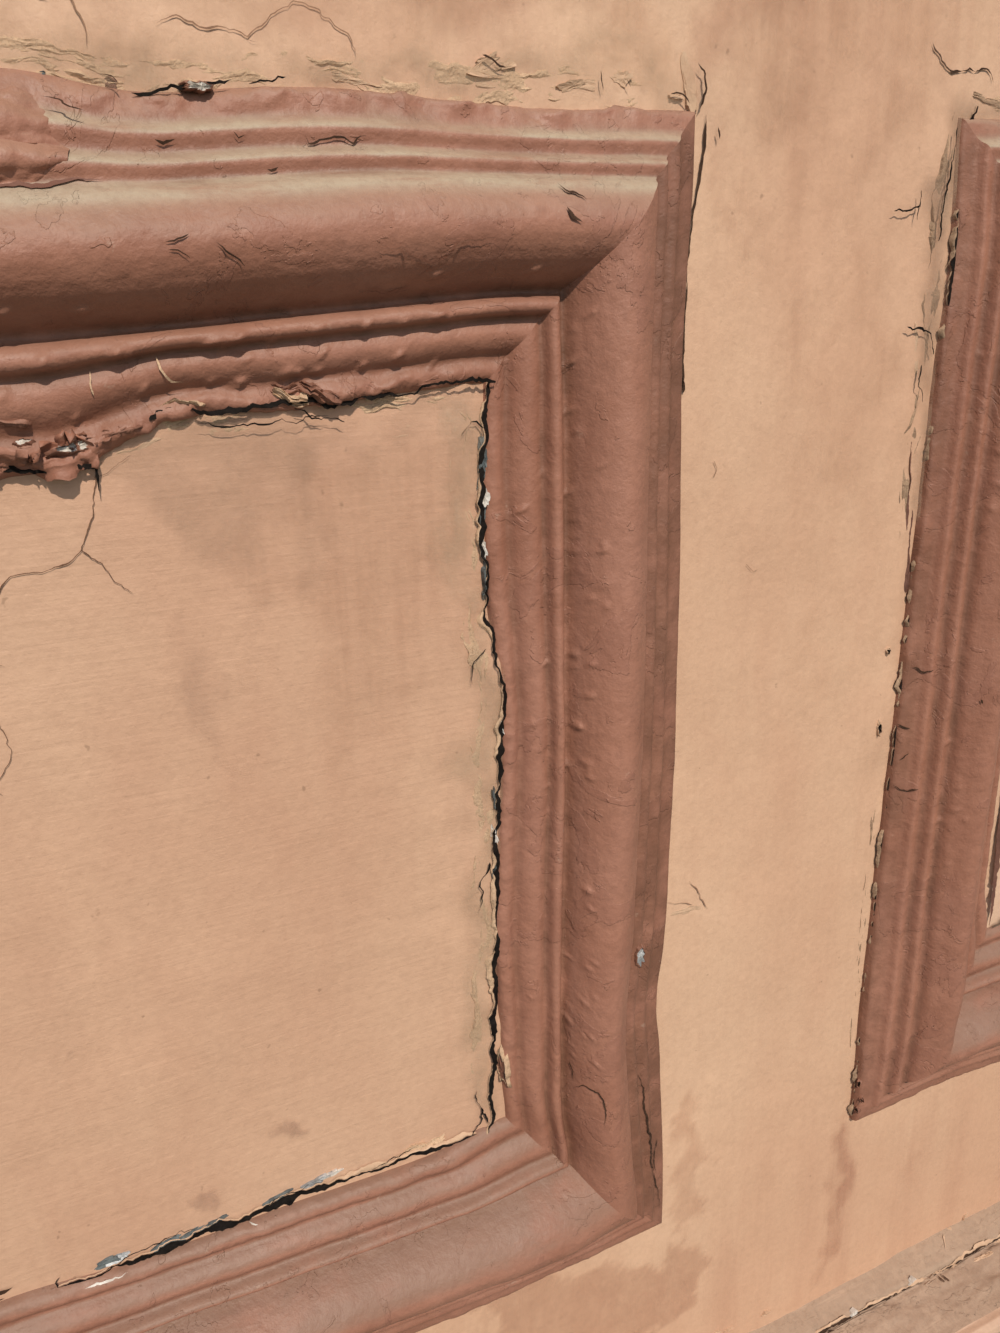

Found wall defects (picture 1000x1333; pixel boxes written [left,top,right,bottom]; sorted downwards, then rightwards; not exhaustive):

peeling [35,62,126,90]
peeling [178,80,214,94]
spalling [466,51,516,88]
spalling [555,70,633,92]
spalling [0,398,250,482]
crack [0,456,132,593]
spalling [58,380,512,1289]
crack [816,1234,1000,1333]
peeling [908,1239,1000,1287]